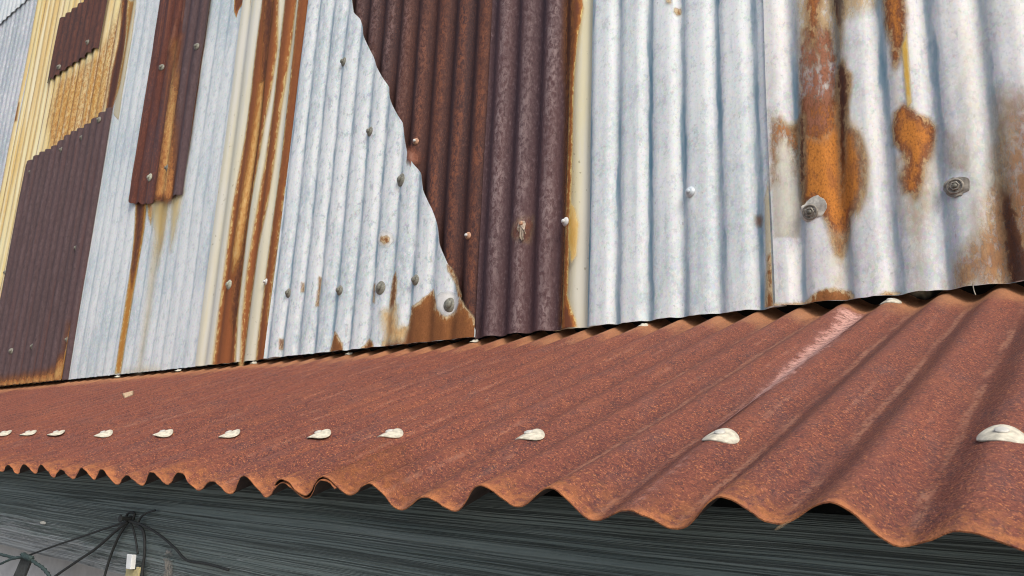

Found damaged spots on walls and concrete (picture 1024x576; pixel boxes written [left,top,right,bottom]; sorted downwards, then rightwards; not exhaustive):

corrosion [0,326,70,385]
corrosion [50,0,136,143]
corrosion [115,79,181,374]
corrosion [213,0,308,366]
corrosion [330,332,343,352]
corrosion [378,230,393,246]
corrosion [362,264,475,348]
corrosion [560,0,583,328]
corrosion [765,187,854,307]
corrosion [798,0,936,257]